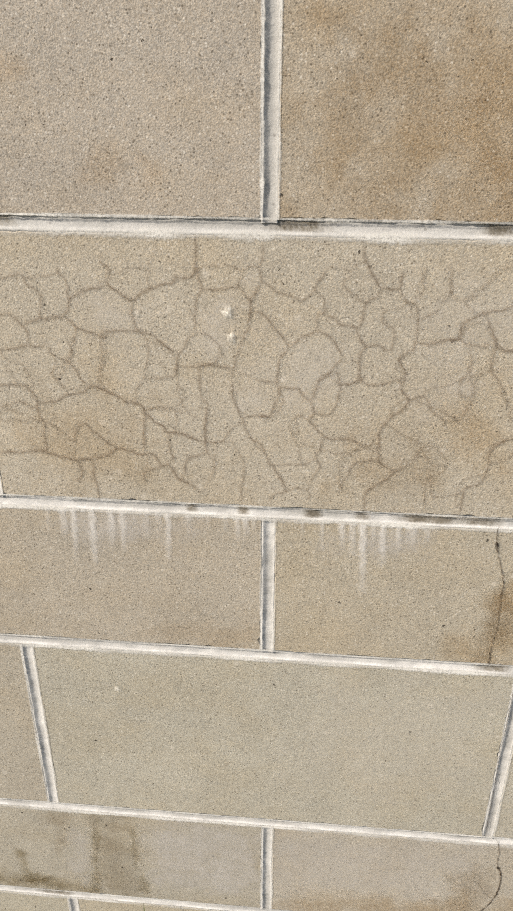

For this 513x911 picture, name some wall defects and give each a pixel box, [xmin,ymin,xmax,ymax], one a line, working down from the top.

crack [488,529,504,663]